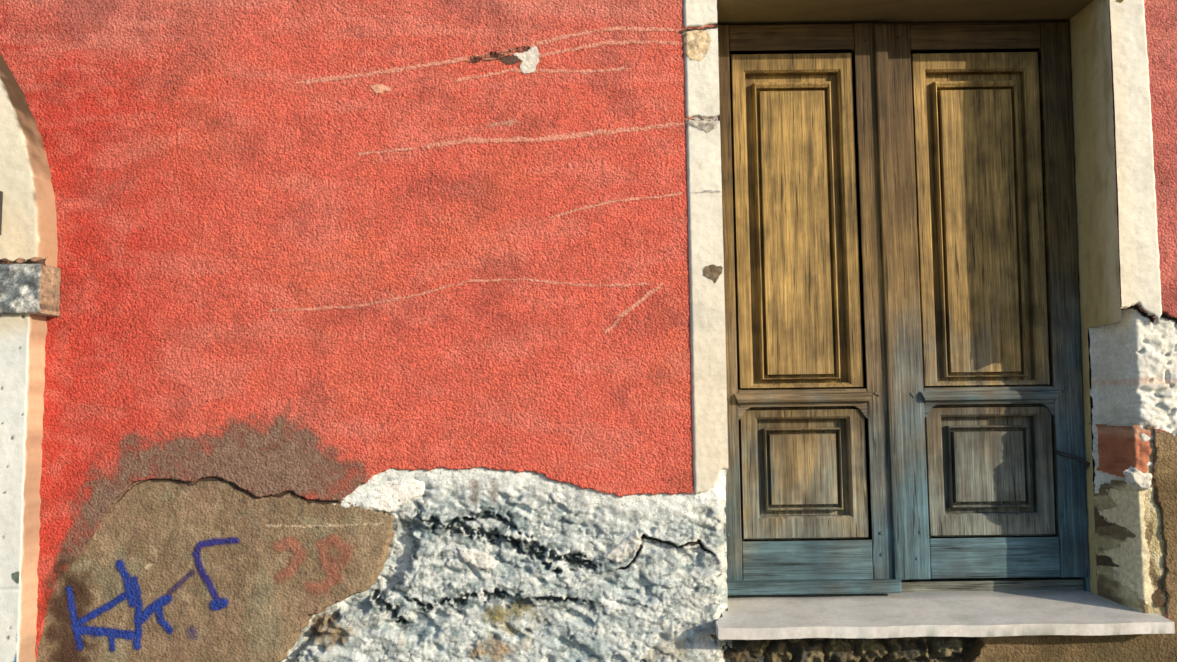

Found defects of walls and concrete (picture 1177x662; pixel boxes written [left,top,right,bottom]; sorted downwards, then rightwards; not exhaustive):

flaking render [679,26,716,61]
leakage [46,415,366,662]
flaking render [36,467,733,662]
flaking render [961,305,1177,662]